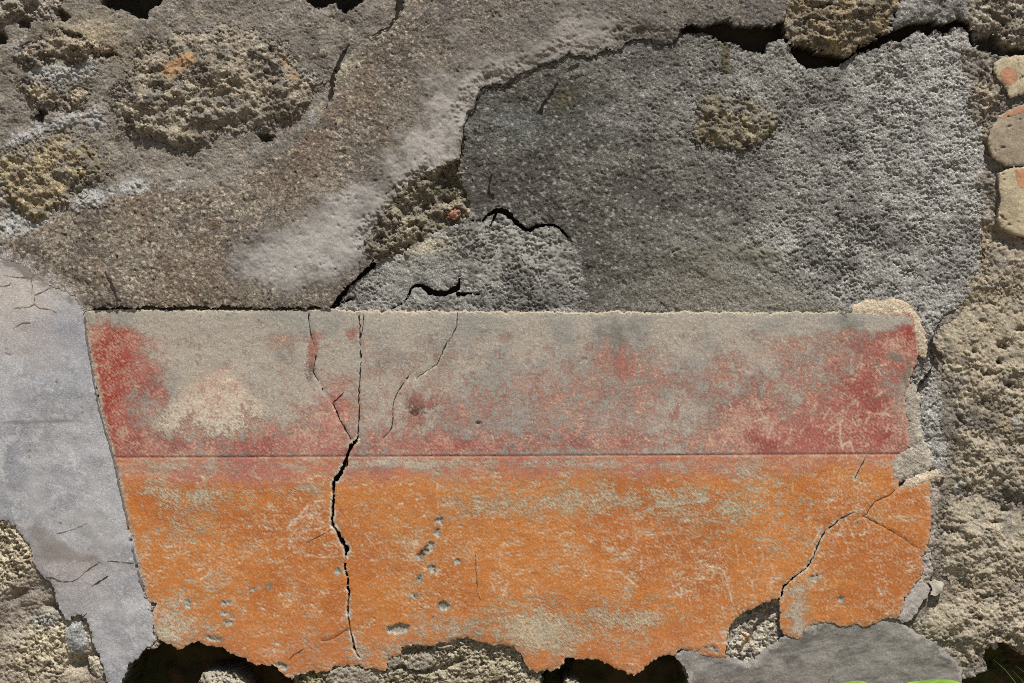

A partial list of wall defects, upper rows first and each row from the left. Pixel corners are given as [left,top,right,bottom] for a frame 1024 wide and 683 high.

crack [466,35,680,132]
spalling [364,151,578,288]
crack [472,173,576,244]
crack [46,262,479,660]
crack [779,490,914,602]
spalling [276,588,704,683]
flaking render [897,579,944,623]